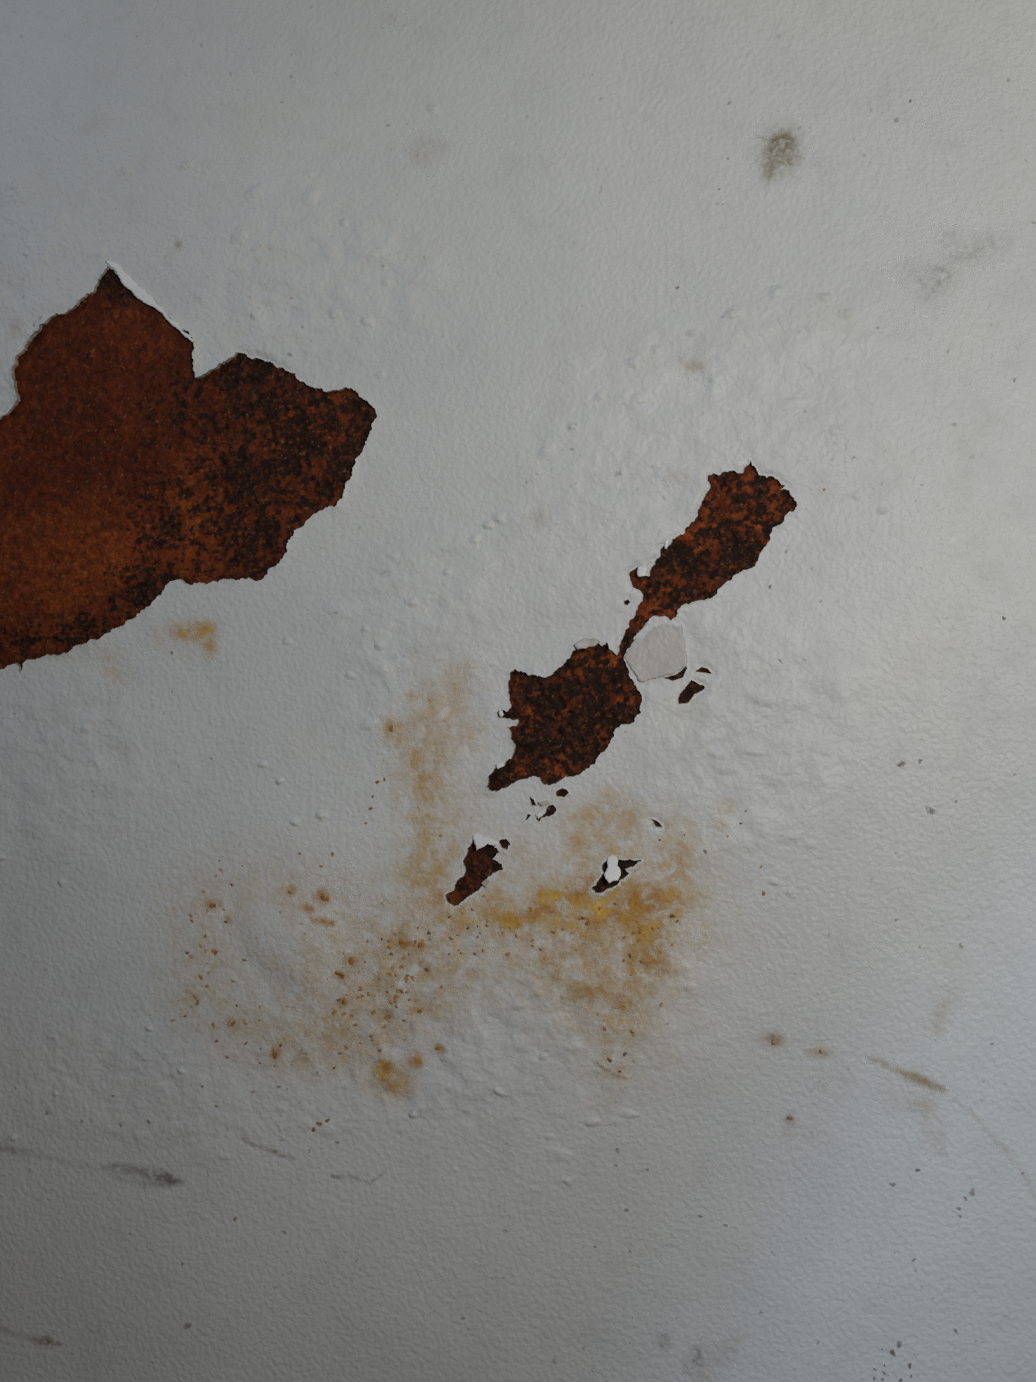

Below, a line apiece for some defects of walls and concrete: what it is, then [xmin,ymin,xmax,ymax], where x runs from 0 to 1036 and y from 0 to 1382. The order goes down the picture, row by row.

peeling [0,259,377,673]
peeling [486,461,797,822]
peeling [445,833,510,906]
rust [413,854,685,976]
peeling [591,855,641,893]
rust [327,927,431,1091]